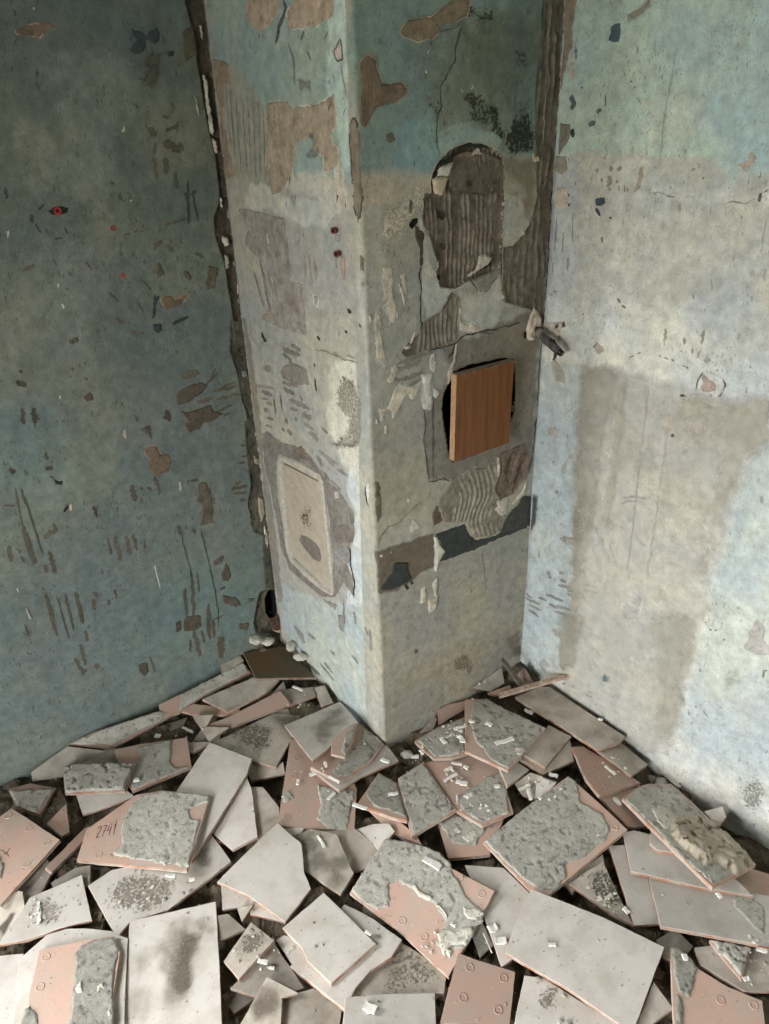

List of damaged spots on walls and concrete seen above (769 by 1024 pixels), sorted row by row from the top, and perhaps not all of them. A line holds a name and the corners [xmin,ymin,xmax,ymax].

peeling [245,0,334,30]
peeling [265,53,408,222]
peeling [333,39,343,62]
crack [436,10,493,154]
spalling [369,0,583,462]
water stain [464,93,536,155]
peeling [595,166,644,219]
water stain [525,369,641,716]
spalling [0,319,769,1024]